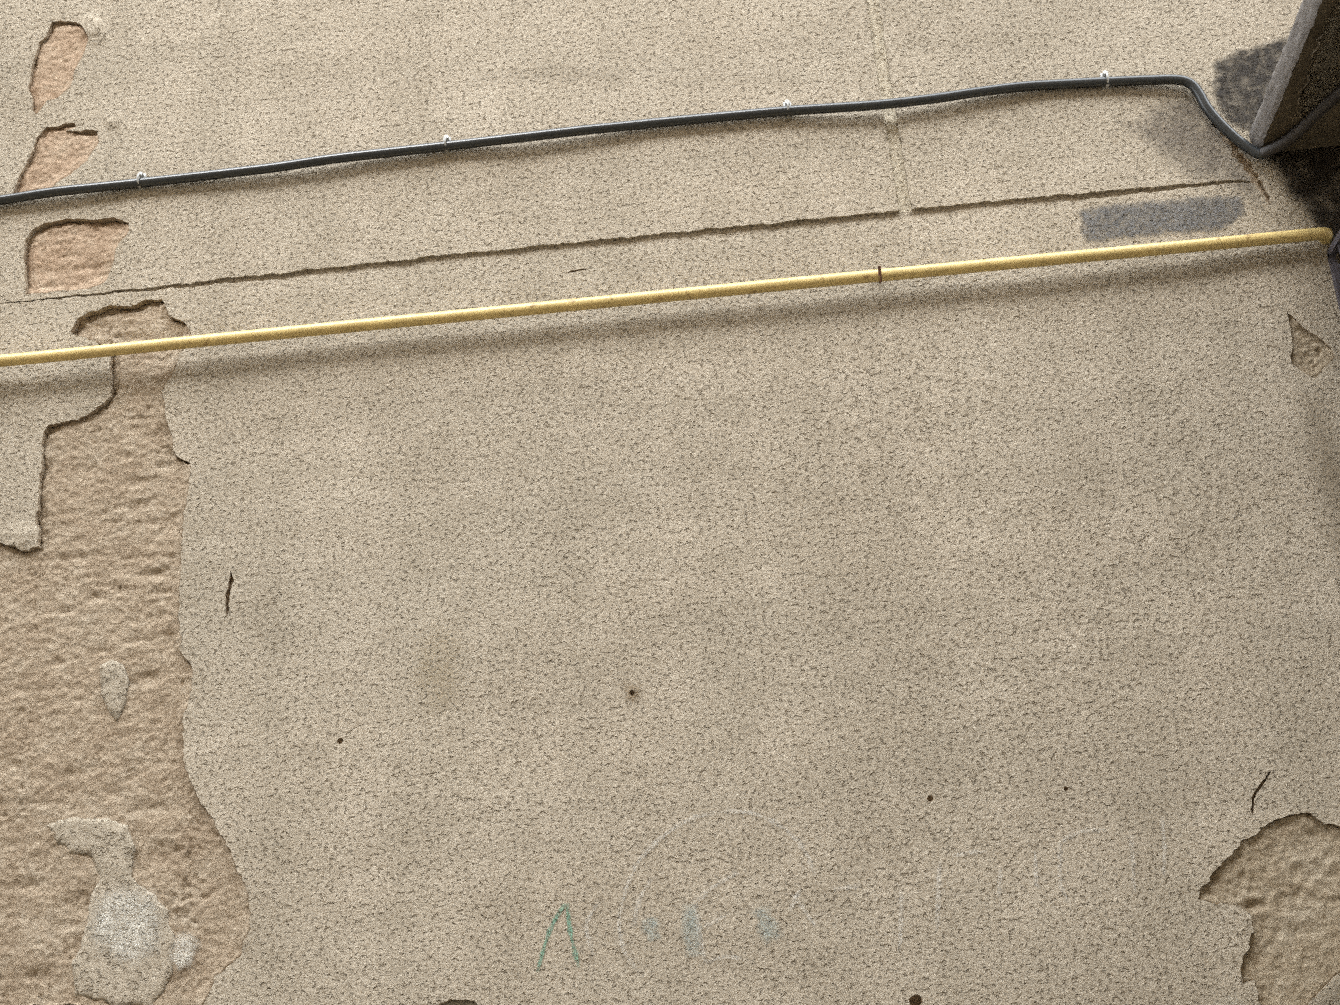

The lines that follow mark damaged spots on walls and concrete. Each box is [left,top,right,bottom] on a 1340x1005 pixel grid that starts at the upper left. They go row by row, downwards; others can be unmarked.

flaking render [28,21,88,114]
flaking render [13,123,99,193]
flaking render [23,217,129,294]
flaking render [1287,313,1334,378]
flaking render [0,299,251,1005]
flaking render [1198,812,1340,1005]